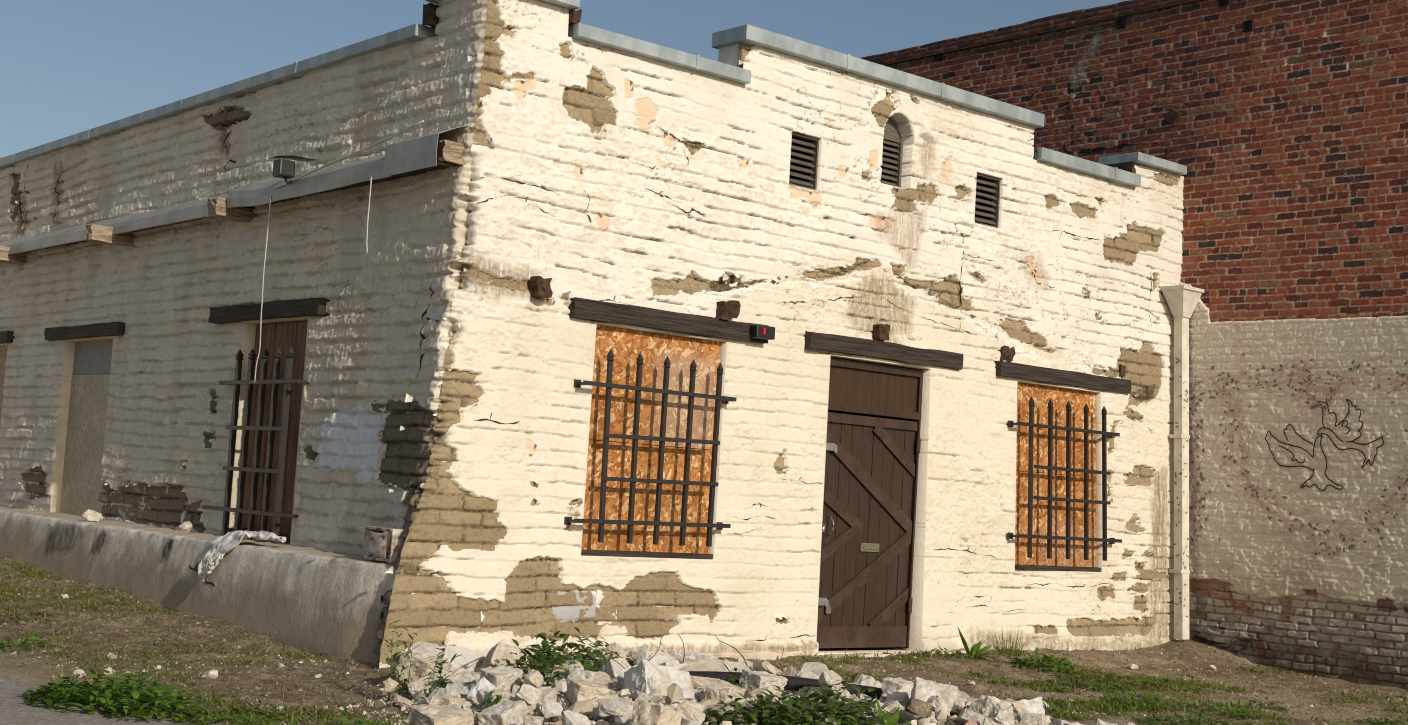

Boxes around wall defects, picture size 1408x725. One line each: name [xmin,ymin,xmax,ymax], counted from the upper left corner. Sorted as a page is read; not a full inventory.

peeling [466,0,536,150]
peeling [562,67,706,155]
peeling [871,90,918,127]
peeling [867,156,970,230]
peeling [1045,195,1105,219]
peeling [1103,223,1167,266]
peeling [651,258,985,311]
peeling [997,317,1054,354]
peeling [1092,342,1163,503]
peeling [98,462,207,532]
peeling [371,318,720,668]
peeling [1033,514,1169,637]